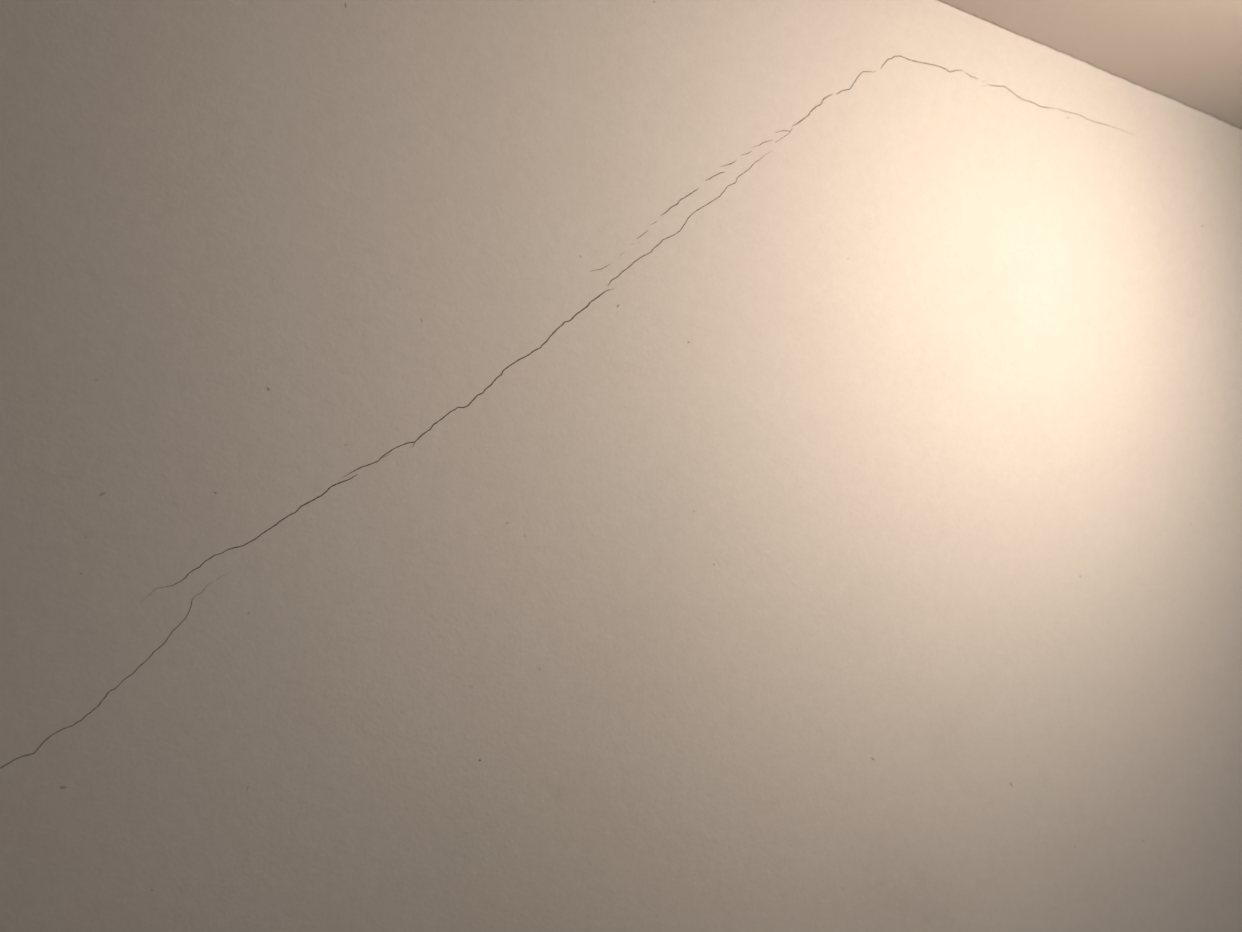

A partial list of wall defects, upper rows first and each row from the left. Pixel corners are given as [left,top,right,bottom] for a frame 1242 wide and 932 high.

crack [0,56,1134,768]